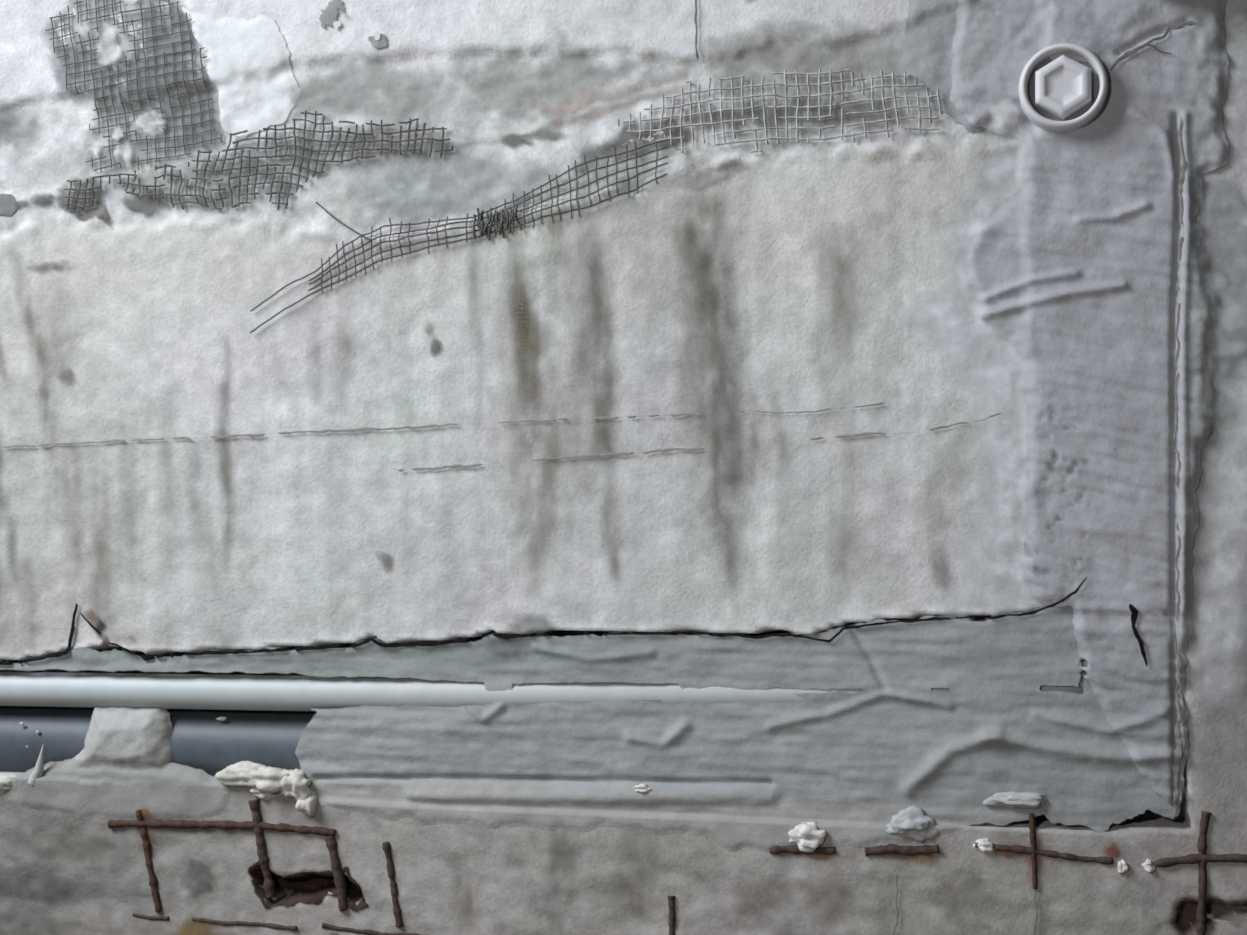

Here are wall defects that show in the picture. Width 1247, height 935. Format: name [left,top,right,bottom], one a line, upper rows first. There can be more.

spalling [319,0,344,29]
spalling [368,32,387,48]
crack [692,0,700,60]
flaking render [712,26,892,88]
flaking render [0,0,221,222]
spalling [449,118,560,146]
spalling [576,118,691,172]
spalling [690,160,737,190]
damp [686,226,719,351]
damp [512,290,540,401]
crack [1129,119,1186,816]
crack [0,577,1087,665]